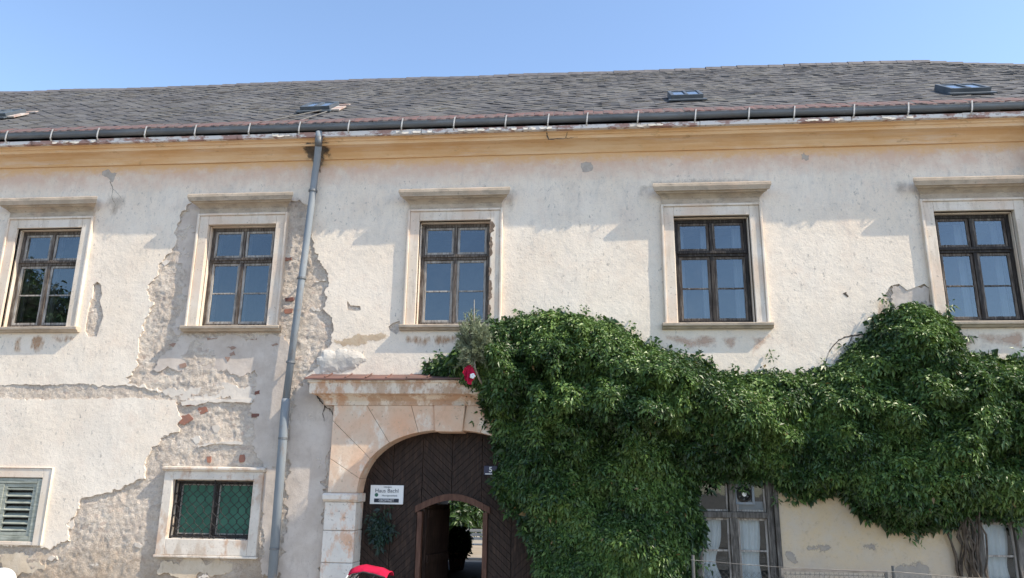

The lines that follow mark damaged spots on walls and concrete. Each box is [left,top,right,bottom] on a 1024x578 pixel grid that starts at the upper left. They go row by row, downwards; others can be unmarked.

water stain [303,142,330,171]
spalling [878,285,931,314]
spalling [0,200,400,578]